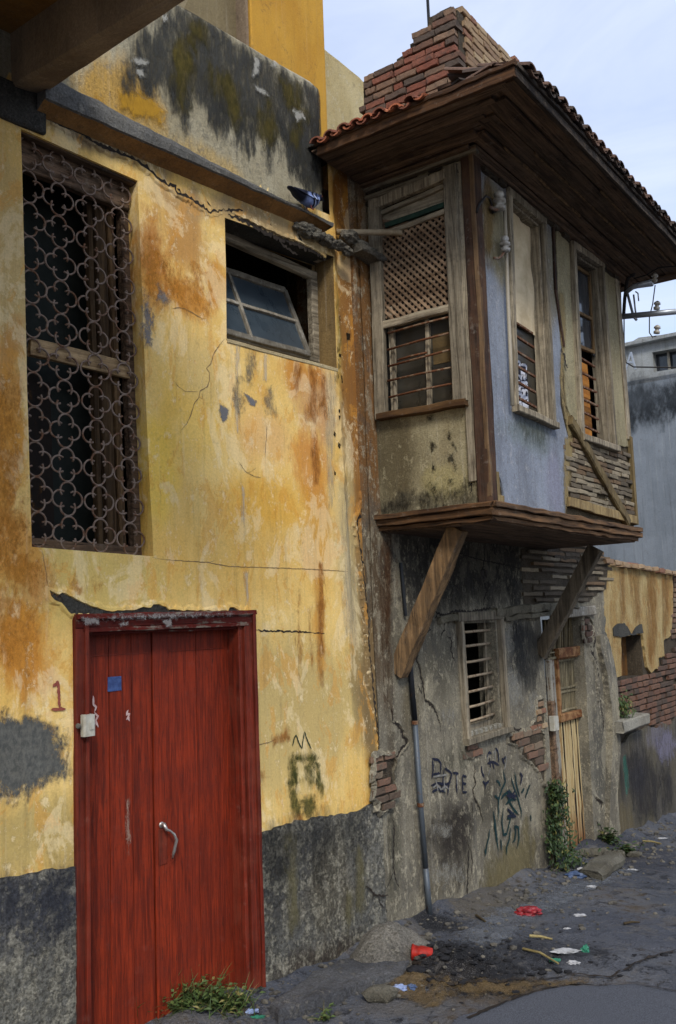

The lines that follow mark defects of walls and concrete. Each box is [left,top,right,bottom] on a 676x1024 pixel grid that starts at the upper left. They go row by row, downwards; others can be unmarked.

damp [121,6,323,208]
crack [46,120,327,260]
crack [174,342,222,428]
corrosion [296,366,325,420]
damp [628,382,676,431]
mould [382,435,473,514]
corrosion [0,384,42,659]
flaking render [45,585,252,627]
crack [152,486,411,763]
crack [416,546,521,731]
flaking render [369,748,401,818]
flaking render [506,695,549,788]